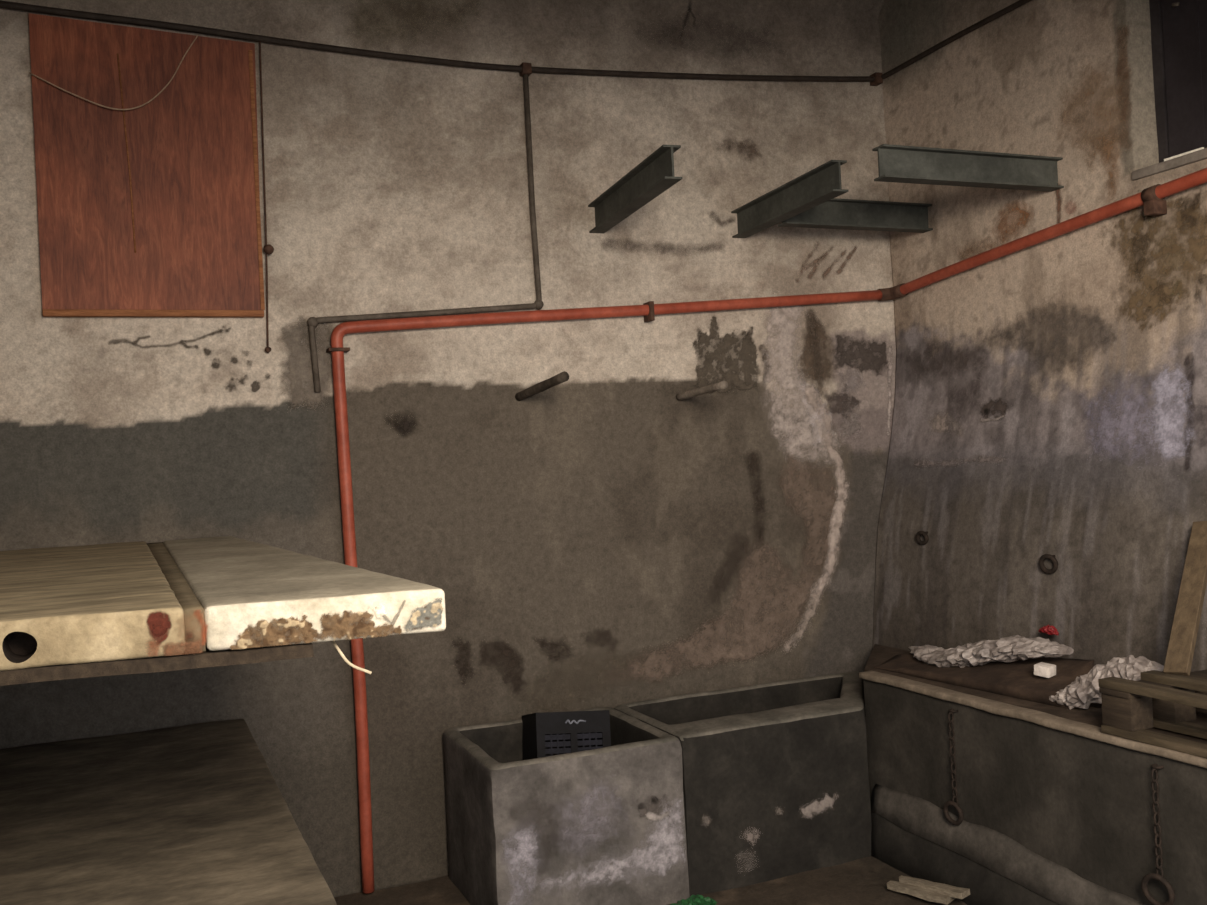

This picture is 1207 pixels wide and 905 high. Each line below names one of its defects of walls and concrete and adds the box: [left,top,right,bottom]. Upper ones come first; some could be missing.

crack [109,330,222,348]
peeling [693,316,771,393]
peeling [835,335,888,375]
peeling [825,393,861,417]
damp [1084,356,1194,470]
flaking render [524,456,837,712]
rust [147,610,207,656]
spalling [230,598,443,650]
damp [503,787,685,905]